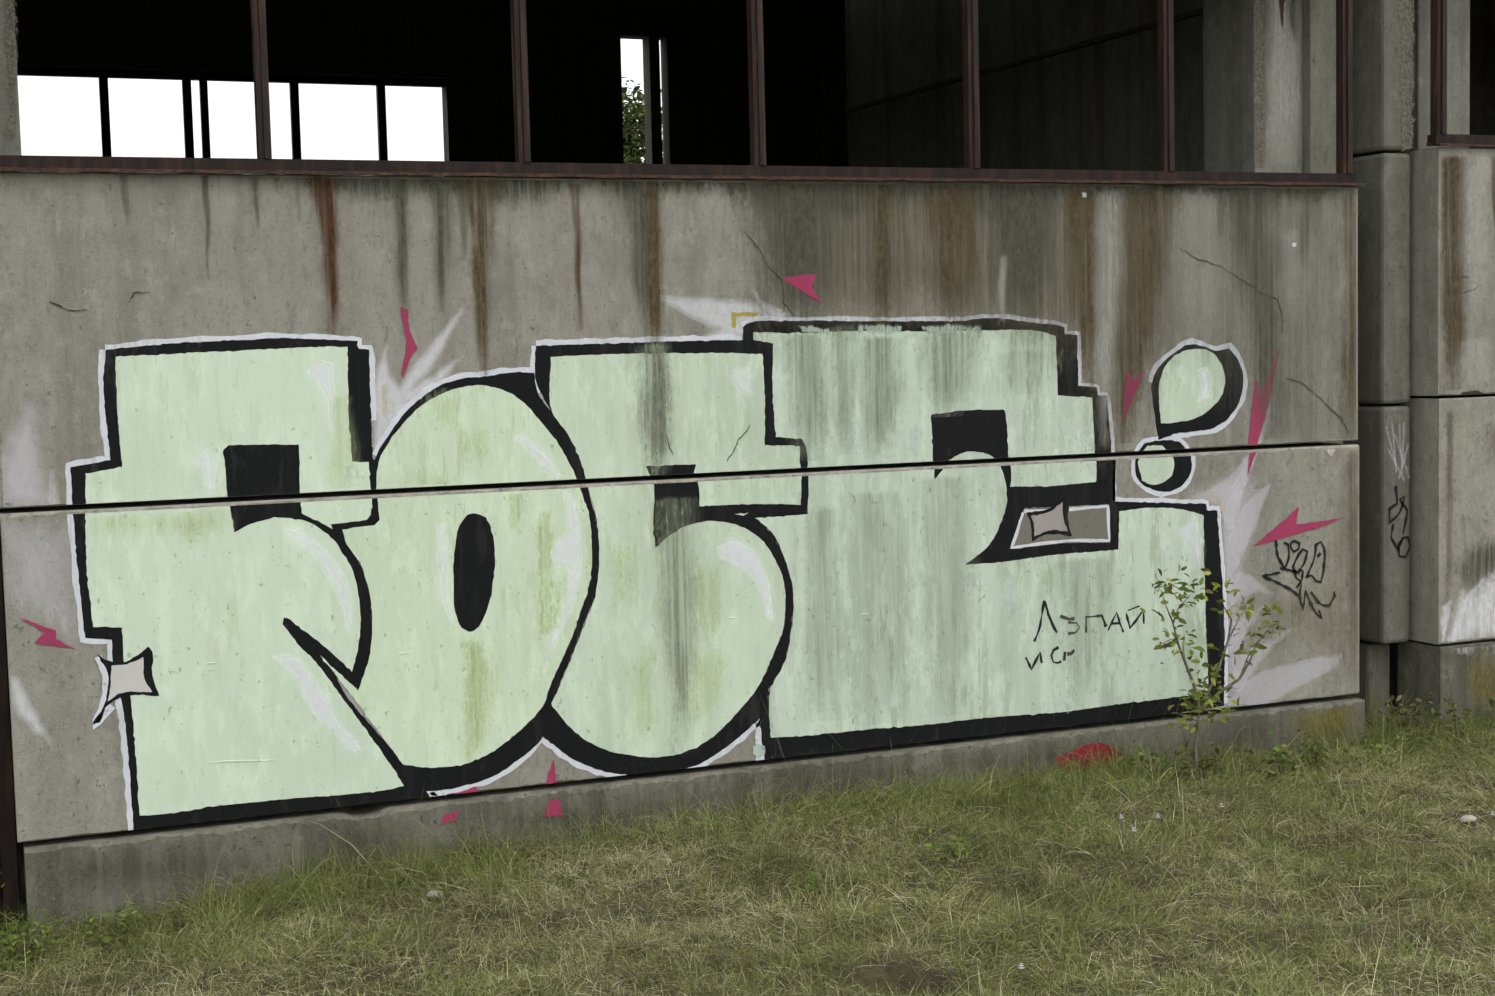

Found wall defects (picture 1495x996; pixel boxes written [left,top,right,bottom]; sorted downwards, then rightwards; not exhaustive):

corrosion [1259,0,1299,121]
corrosion [314,177,337,328]
water stain [303,178,572,367]
water stain [601,181,1347,475]
crack [1179,248,1283,331]
water stain [661,505,690,708]